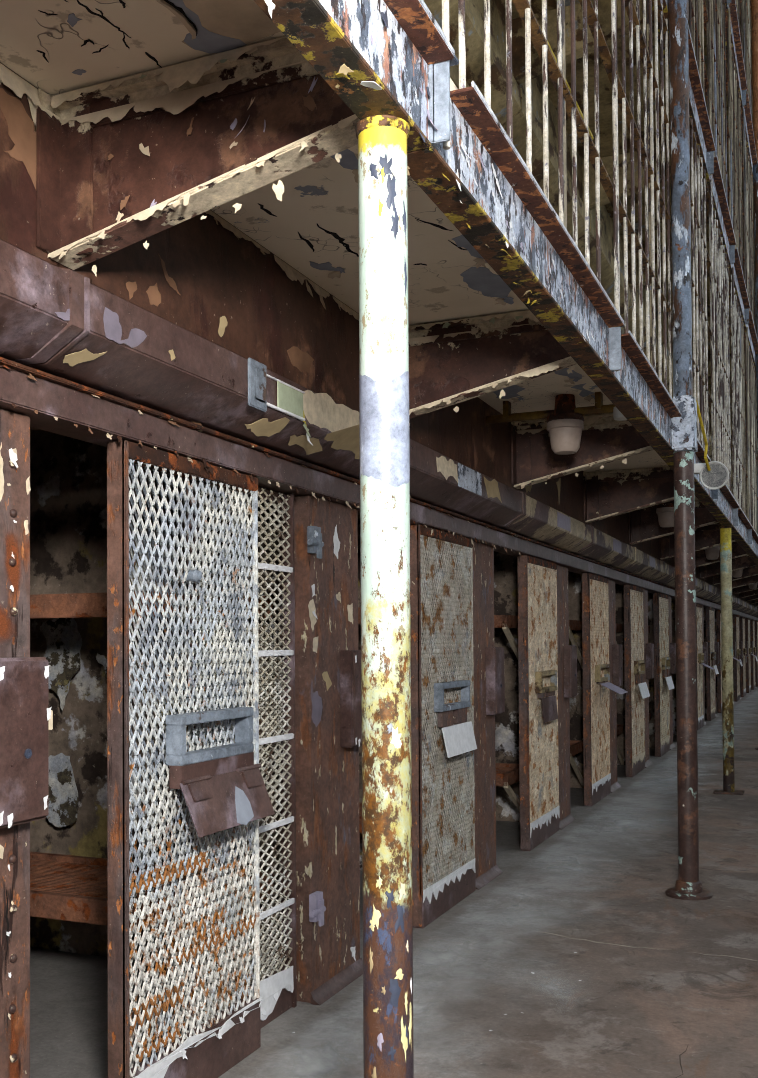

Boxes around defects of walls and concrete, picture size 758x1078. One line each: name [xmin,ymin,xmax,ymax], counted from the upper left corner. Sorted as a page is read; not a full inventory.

crack [38,0,162,68]
peeling [0,0,308,189]
peeling [47,114,357,259]
crack [258,203,277,217]
crack [298,223,359,257]
crack [415,218,467,250]
peeling [245,390,360,459]
rust [129,852,210,897]
rust [176,913,256,965]
rust [130,982,184,1031]
rust [136,1022,181,1062]
peeling [133,966,294,1078]